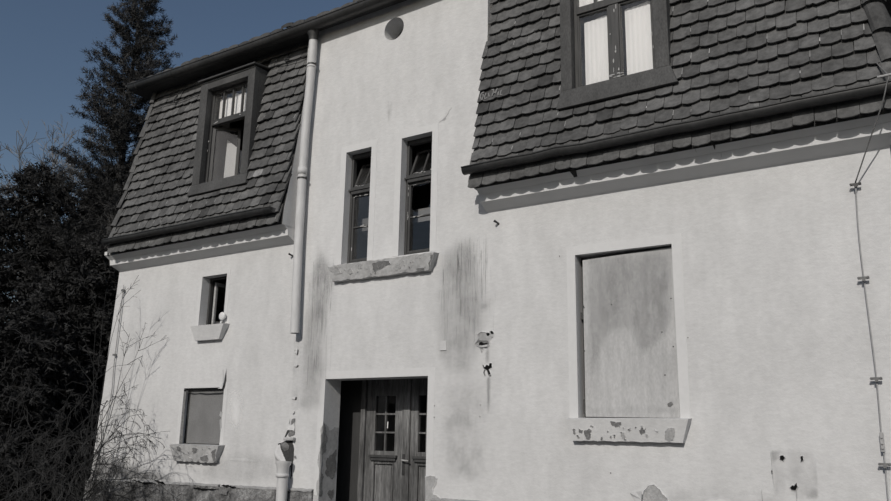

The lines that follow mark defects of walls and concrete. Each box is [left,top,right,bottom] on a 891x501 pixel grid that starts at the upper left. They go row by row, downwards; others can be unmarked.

peeling [169,374,226,462]
flaking render [274,411,296,479]
peeling [314,421,339,501]
peeling [573,421,675,441]
flaking render [630,484,669,501]